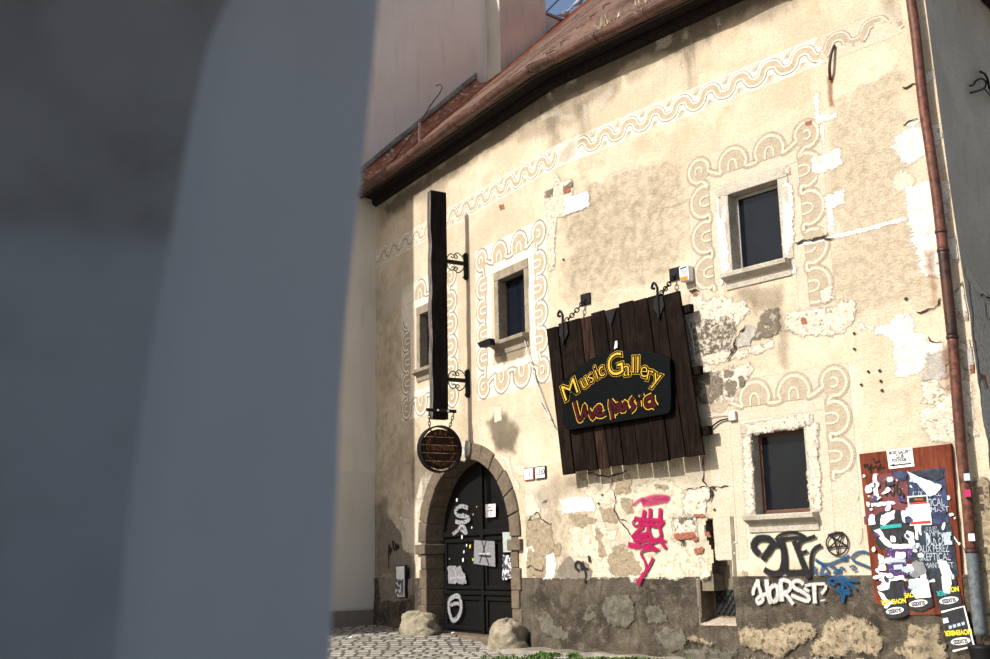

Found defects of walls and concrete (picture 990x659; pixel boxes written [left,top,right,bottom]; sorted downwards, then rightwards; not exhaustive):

spalling [889,120,943,166]
spalling [544,172,590,272]
peeling [823,187,846,235]
crack [795,217,907,247]
spalling [904,179,959,278]
spalling [685,199,875,404]
peeling [399,472,432,565]
peeling [499,454,715,583]
crack [587,469,634,539]
spalling [971,476,990,574]
flaking render [654,615,883,659]
flaking render [894,624,948,659]